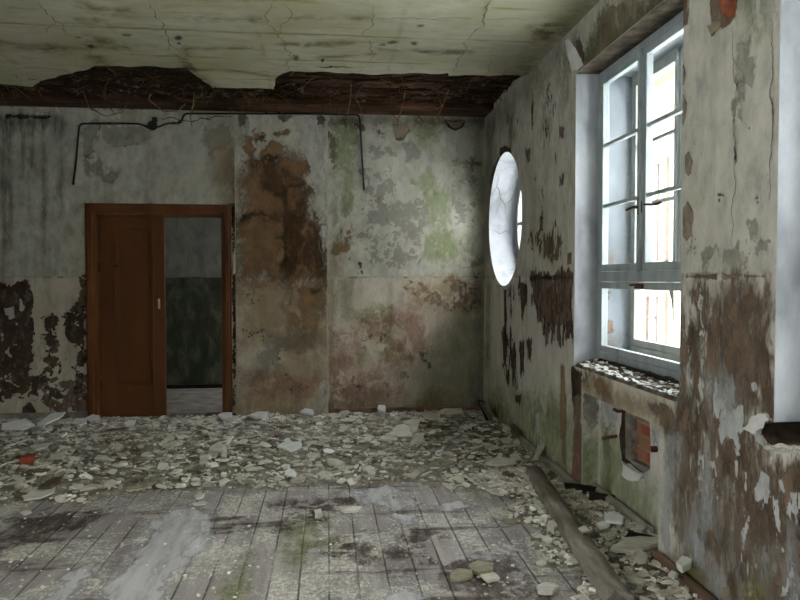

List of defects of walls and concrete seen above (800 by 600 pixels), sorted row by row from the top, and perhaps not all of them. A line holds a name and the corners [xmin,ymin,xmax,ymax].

crack [320,0,523,74]
spalling [707,0,737,36]
peeling [278,115,337,250]
spalling [531,85,565,141]
crack [731,34,745,238]
crack [767,18,775,197]
peeling [0,274,87,413]
flaking render [229,203,271,415]
peeling [501,178,574,405]
peeling [665,202,800,600]
spalling [622,464,645,481]